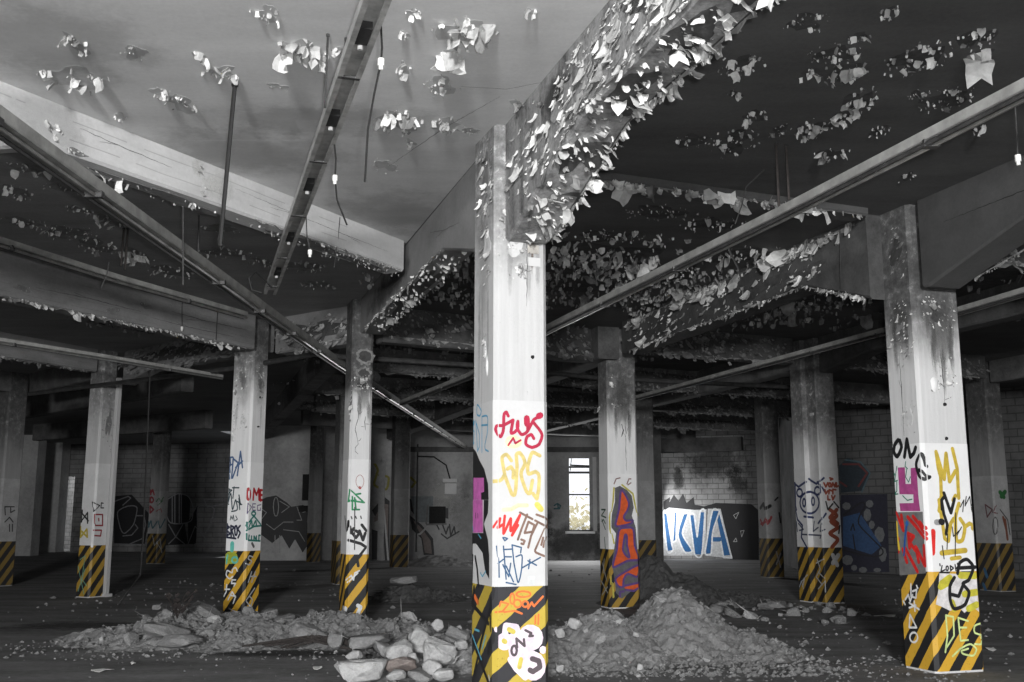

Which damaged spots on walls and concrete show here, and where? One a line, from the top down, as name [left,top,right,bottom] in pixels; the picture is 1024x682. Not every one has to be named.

peeling [249,4,279,28]
peeling [36,31,109,96]
peeling [120,45,152,61]
peeling [191,51,239,85]
peeling [267,38,343,91]
peeling [148,87,198,114]
peeling [287,0,1024,434]
peeling [0,284,295,437]